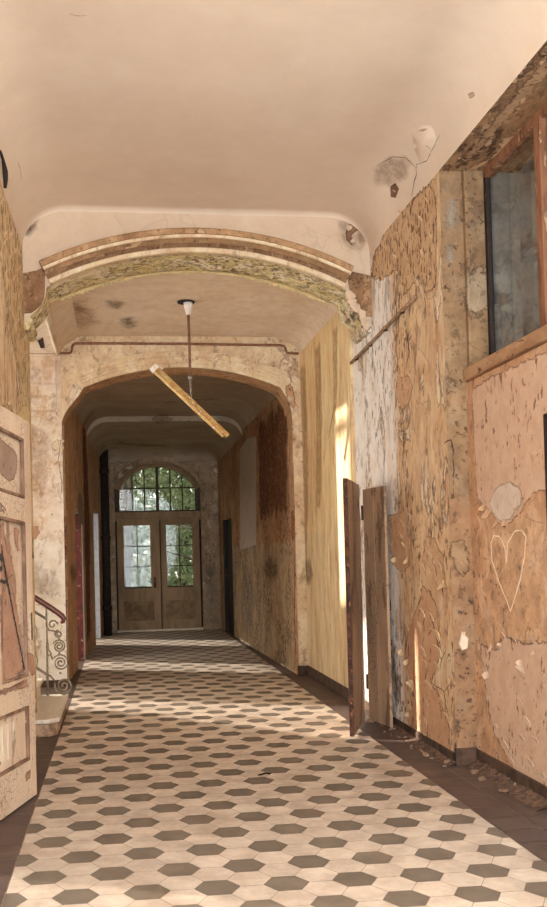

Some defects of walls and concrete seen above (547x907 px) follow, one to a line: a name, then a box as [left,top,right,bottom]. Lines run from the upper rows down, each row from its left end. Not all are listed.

peeling [461,44,547,165]
peeling [60,262,327,304]
spalling [340,290,370,337]
peeling [371,184,437,294]
peeling [396,375,413,409]
peeling [472,353,547,529]
peeling [0,504,35,695]
peeling [388,510,411,572]
peeling [397,536,472,750]
peeling [480,632,547,786]